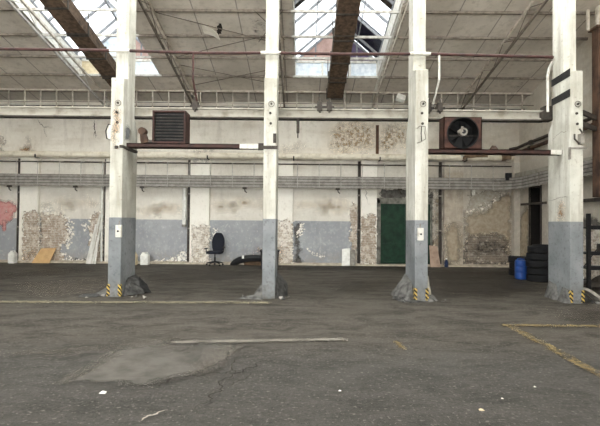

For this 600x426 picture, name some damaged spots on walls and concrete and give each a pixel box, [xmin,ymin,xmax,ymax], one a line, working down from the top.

peeling [332,126,404,153]
flaking render [40,207,104,261]
flaking render [155,224,218,263]
flaking render [277,217,305,264]
flaking render [348,203,377,264]
flaking render [463,192,511,265]
crack [151,351,281,412]